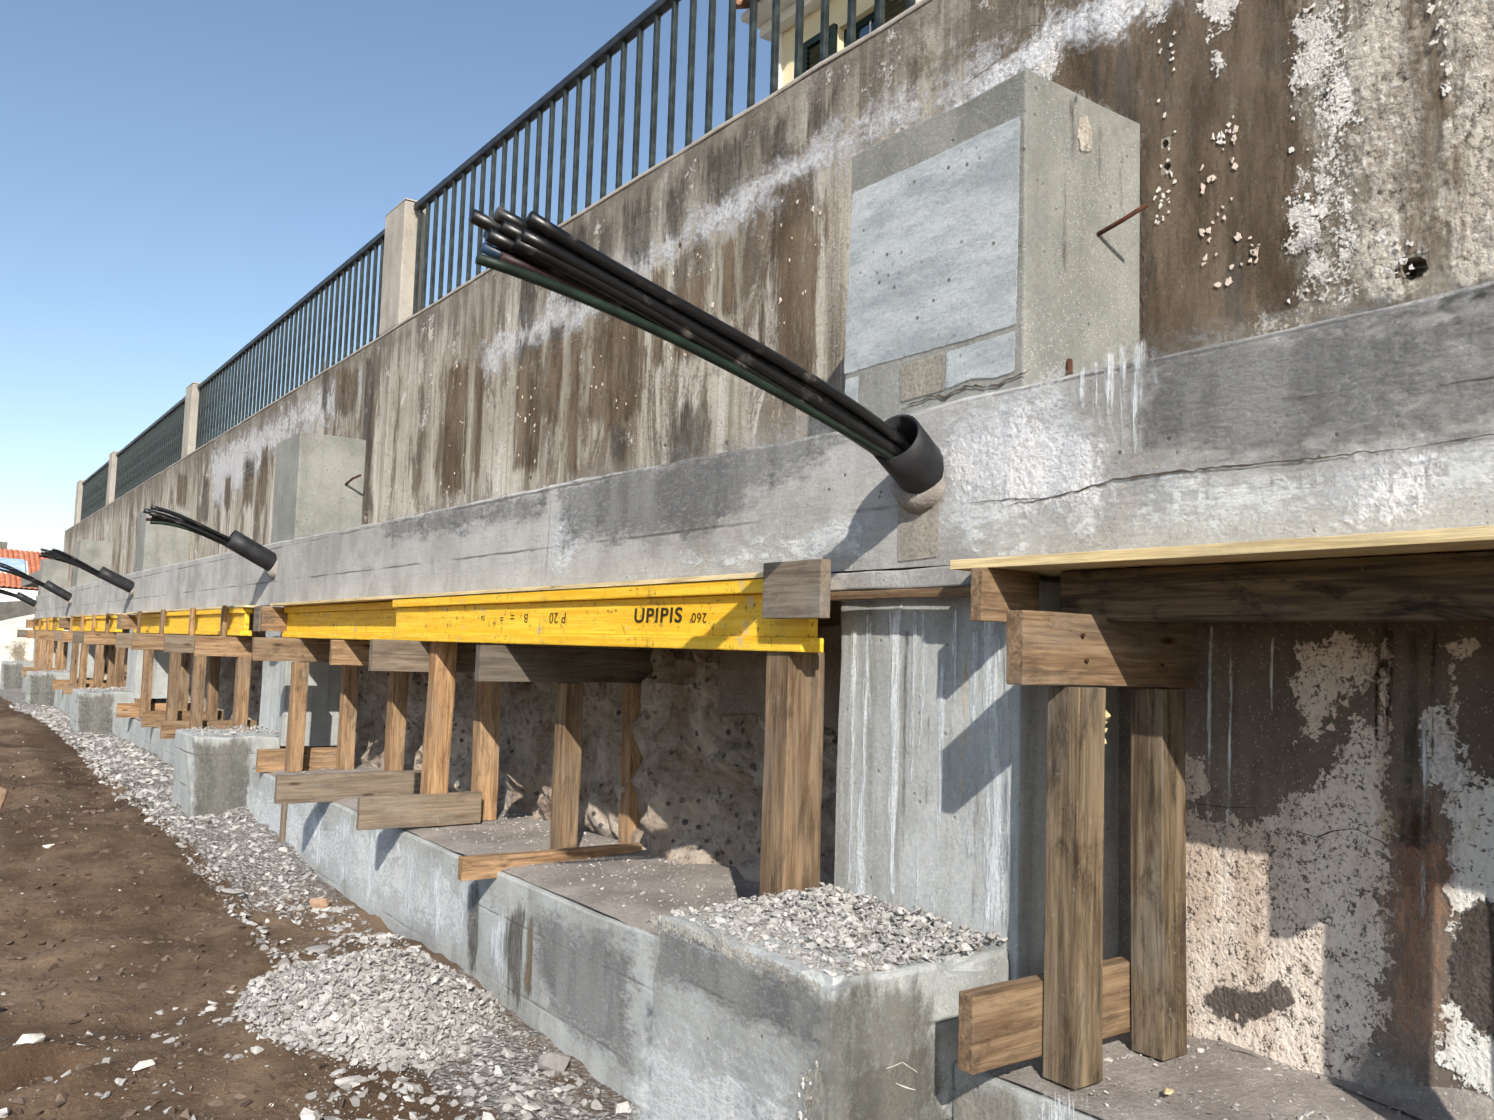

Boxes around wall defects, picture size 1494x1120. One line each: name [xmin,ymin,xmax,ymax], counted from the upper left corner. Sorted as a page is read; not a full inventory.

damp [177,358,374,524]
damp [386,280,864,569]
damp [571,0,1494,554]
crack [971,434,1494,506]
crack [1439,376,1494,386]
peeling [1185,627,1401,1084]
peeling [1416,637,1494,1101]